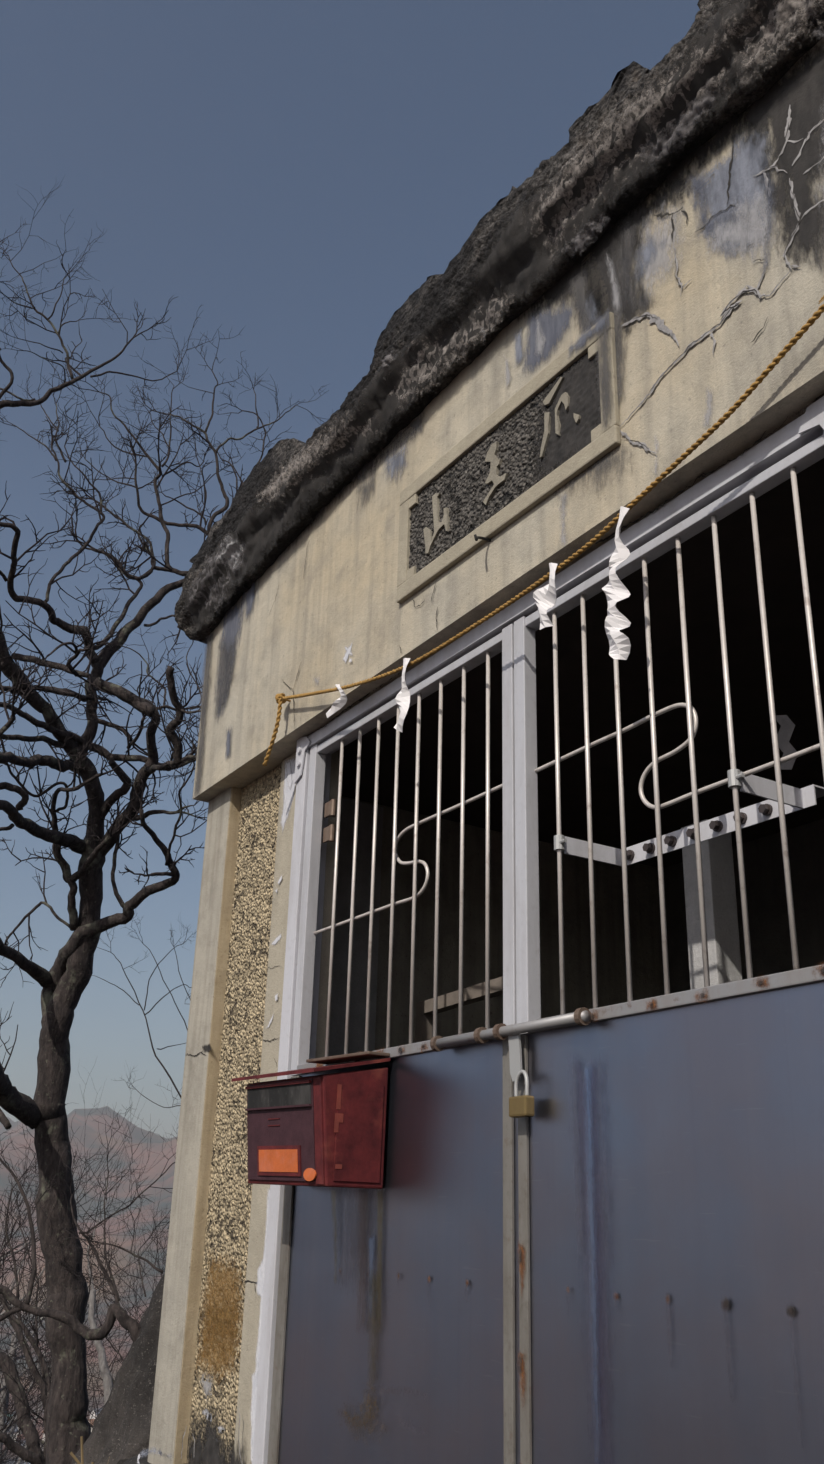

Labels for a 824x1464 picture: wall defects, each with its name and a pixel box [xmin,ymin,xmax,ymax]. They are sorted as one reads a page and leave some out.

leakage [181,0,824,793]
crack [619,106,824,454]
leakage [196,1259,242,1433]